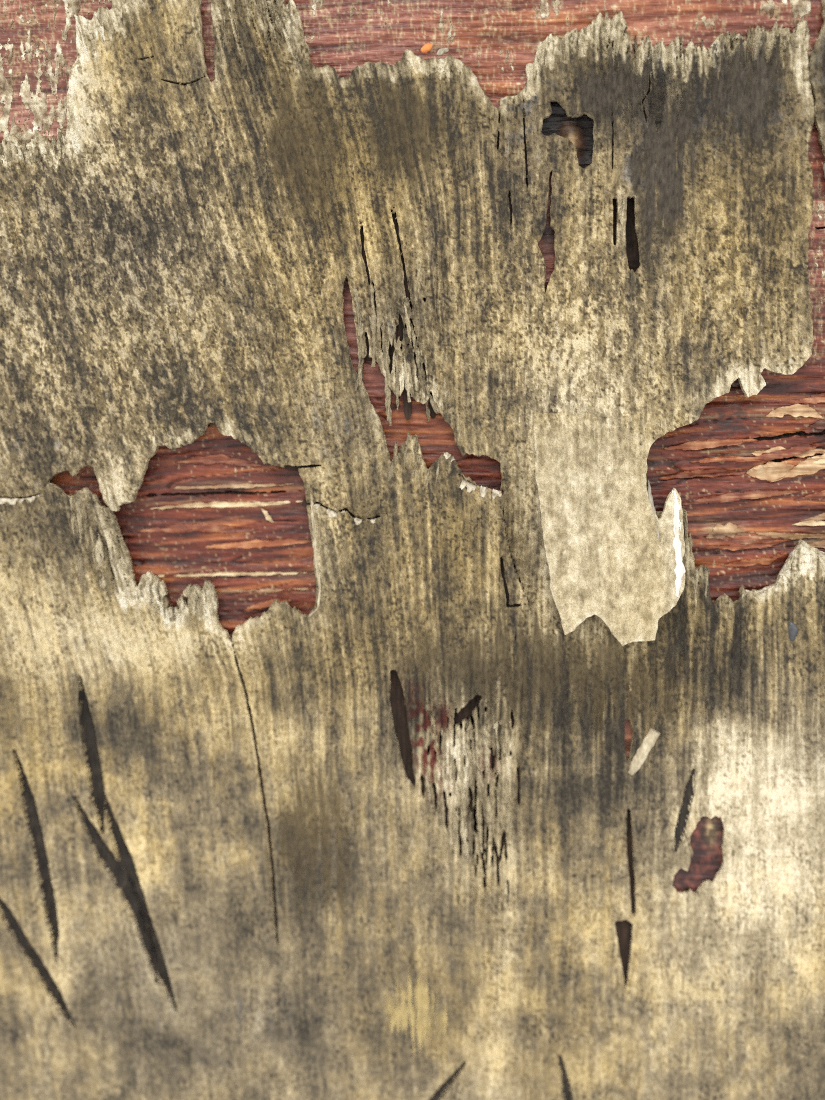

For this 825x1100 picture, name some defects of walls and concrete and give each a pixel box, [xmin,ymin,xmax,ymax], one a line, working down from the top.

peeling [0,0,215,144]
peeling [284,0,824,108]
peeling [541,101,594,168]
crack [642,78,650,120]
peeling [339,199,504,494]
peeling [533,123,825,646]
peeling [50,423,316,645]
crack [230,636,279,943]
crack [390,670,413,780]
crack [454,695,482,724]
crack [615,808,635,984]
peeling [672,769,723,892]